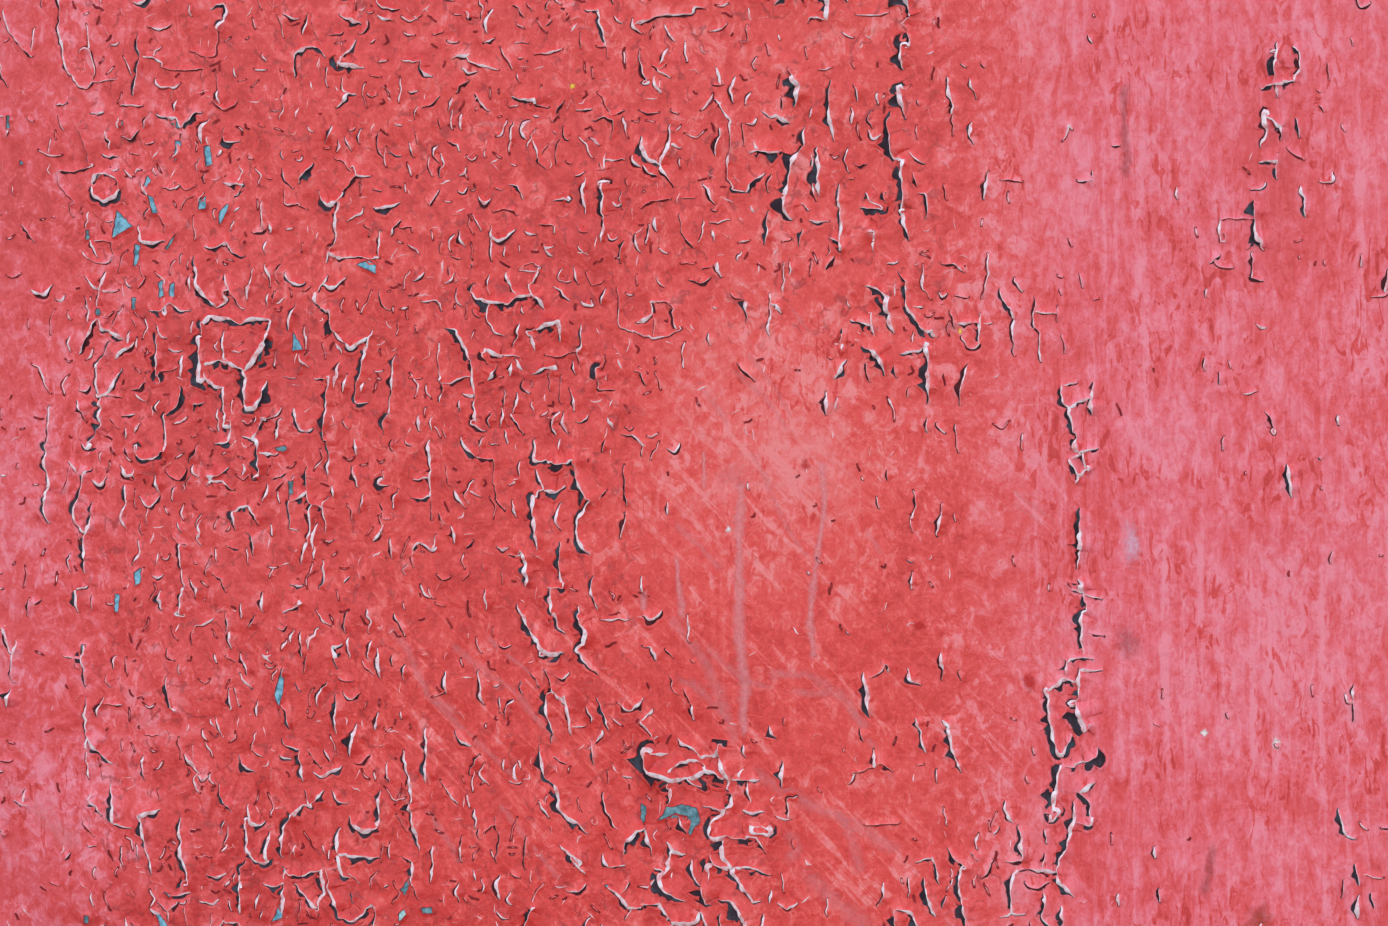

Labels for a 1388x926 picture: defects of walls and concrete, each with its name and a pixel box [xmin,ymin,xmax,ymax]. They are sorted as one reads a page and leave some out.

crack [0,308,74,524]
crack [0,0,300,229]
crack [187,105,356,309]
crack [368,0,859,637]
peeling [675,0,969,438]
peeling [1052,374,1122,487]
peeling [1239,40,1311,252]
crack [62,486,697,926]
crack [842,652,972,827]
peeling [876,591,1110,926]
peeling [1330,808,1388,844]
peeling [1340,862,1385,920]